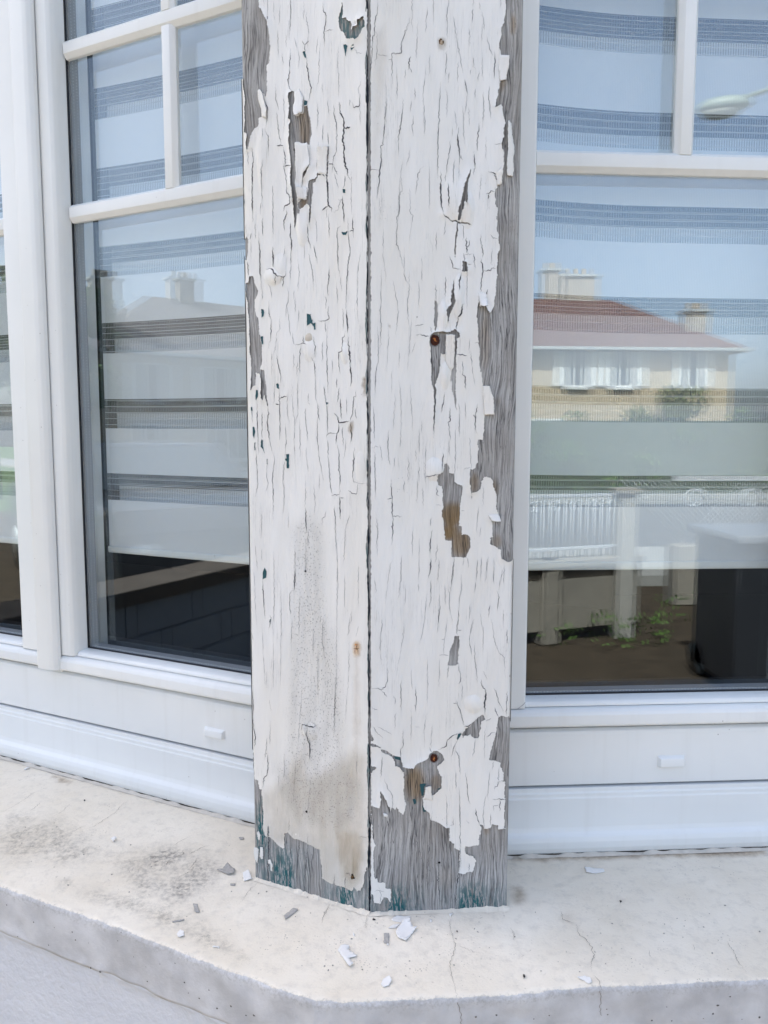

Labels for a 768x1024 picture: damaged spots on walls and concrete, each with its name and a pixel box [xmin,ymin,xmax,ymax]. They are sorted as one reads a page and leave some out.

peeling [242,0,270,147]
peeling [289,89,328,225]
peeling [247,276,280,412]
peeling [429,281,459,430]
peeling [437,0,522,562]
crack [240,0,508,1023]
peeling [243,715,509,940]